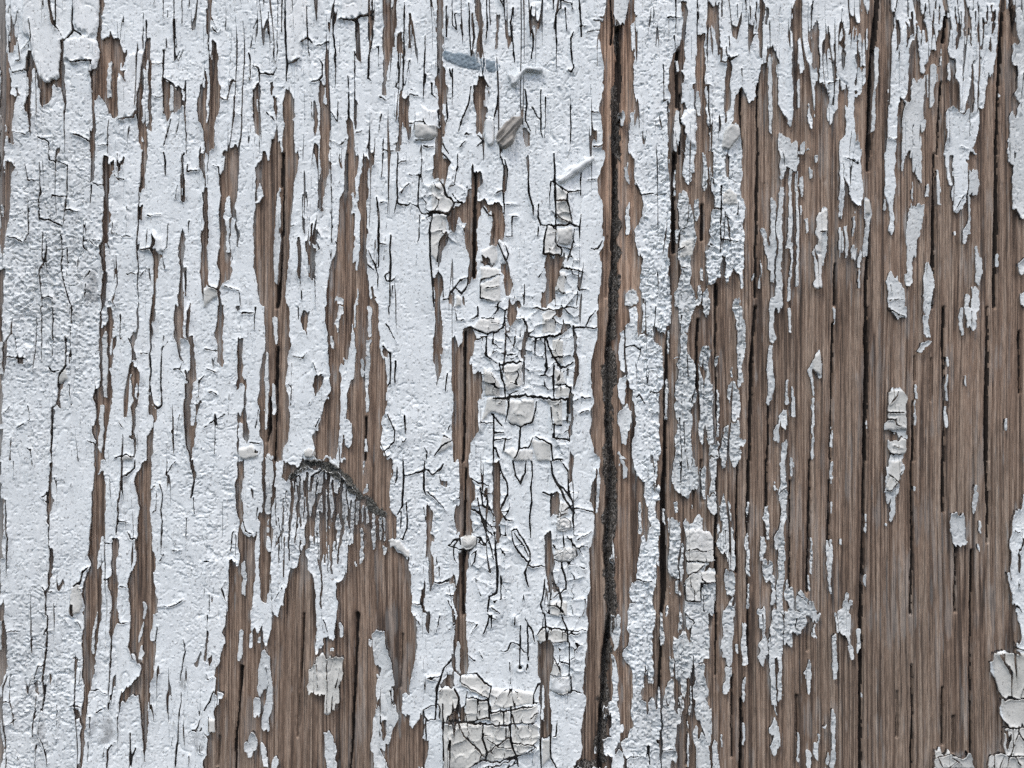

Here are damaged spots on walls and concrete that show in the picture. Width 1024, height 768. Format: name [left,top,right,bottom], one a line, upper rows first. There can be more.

crack [9,0,190,460]
crack [89,441,136,494]
peeling [0,0,242,768]
crack [106,469,195,561]
crack [142,325,237,441]
peeling [200,82,438,768]
crack [175,0,835,768]
peeling [540,0,757,768]
peeling [812,352,821,375]
peeling [884,384,918,493]
crack [4,600,183,747]
peeling [934,750,974,768]